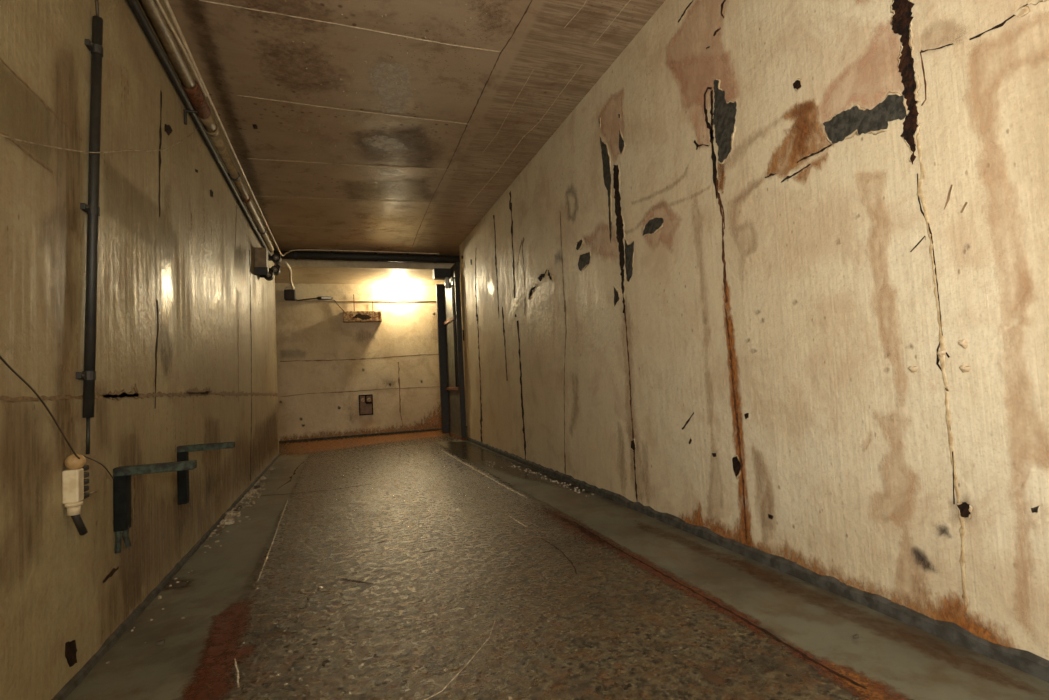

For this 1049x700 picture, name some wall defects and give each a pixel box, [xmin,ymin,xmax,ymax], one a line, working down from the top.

spalling [713,79,737,165]
spalling [823,0,922,164]
crack [920,4,1028,106]
peeling [529,268,554,300]
peeling [575,239,591,271]
crack [910,174,950,371]
corrosion [681,282,1009,648]
crack [948,428,956,504]
corrosion [541,507,767,633]
corrosion [776,644,913,700]